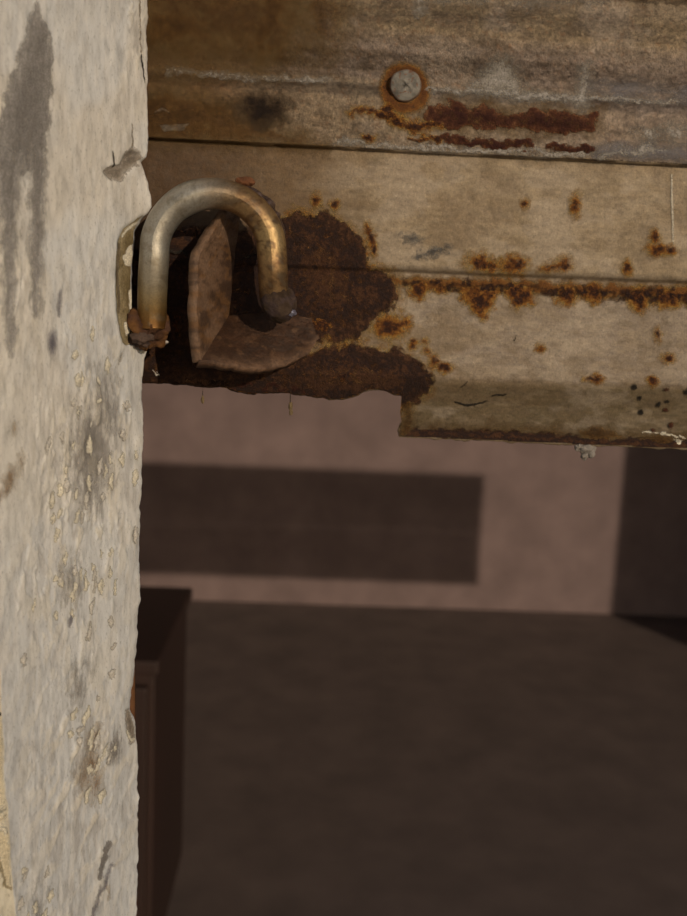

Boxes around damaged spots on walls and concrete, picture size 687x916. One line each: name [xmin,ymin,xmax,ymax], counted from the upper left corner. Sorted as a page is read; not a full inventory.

water stain [0,3,54,352]
rust [346,63,599,154]
rust [127,193,687,448]